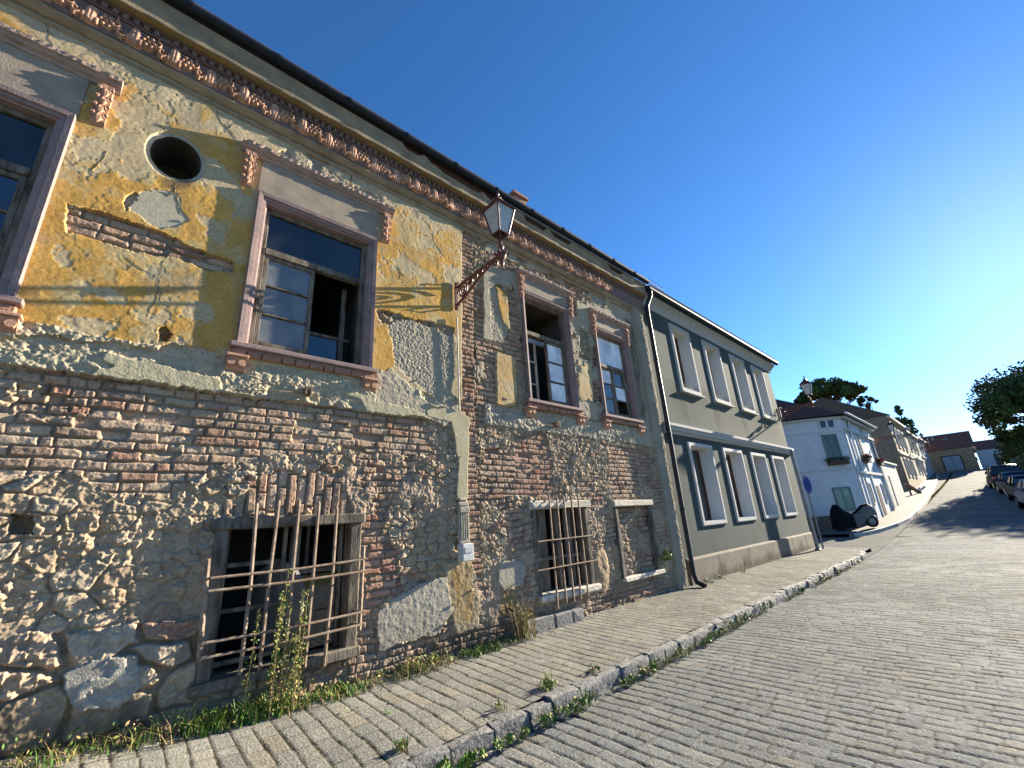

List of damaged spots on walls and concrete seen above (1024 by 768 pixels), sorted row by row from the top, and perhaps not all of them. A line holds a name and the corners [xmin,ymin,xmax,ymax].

spalling [67,188,235,273]
spalling [578,328,591,362]
spalling [0,230,589,592]
peeling [376,576,454,651]